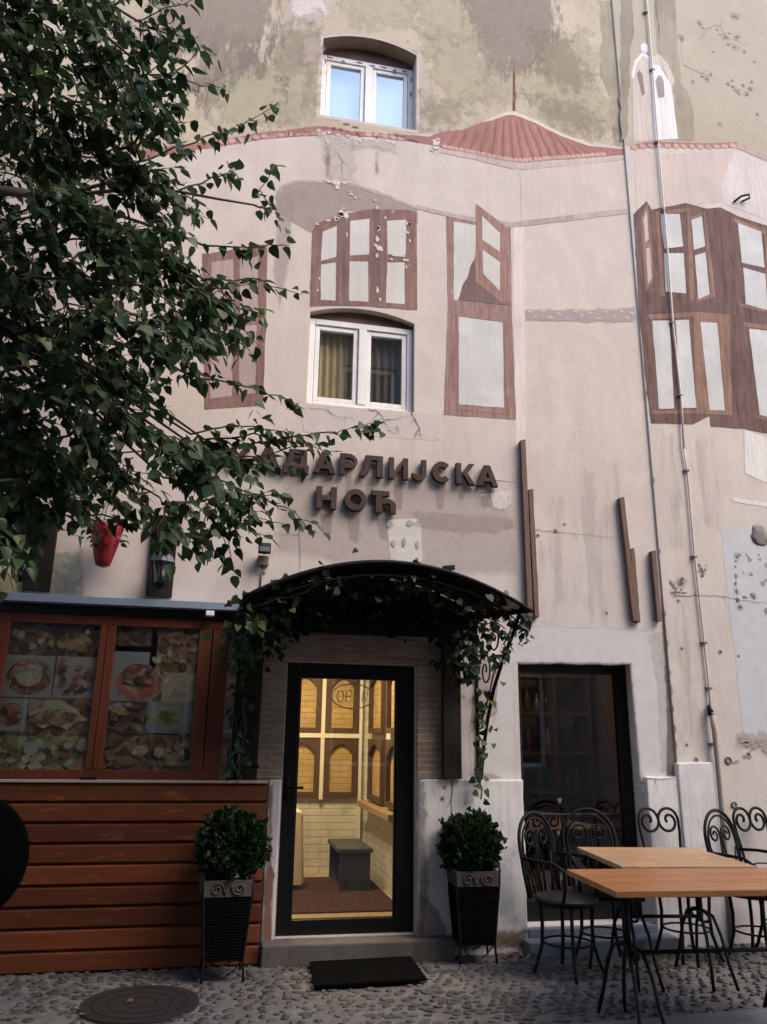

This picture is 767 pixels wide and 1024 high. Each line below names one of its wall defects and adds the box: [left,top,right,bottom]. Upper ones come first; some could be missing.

peeling [289,0,330,21]
crack [656,6,744,80]
peeling [317,123,419,269]
crack [312,408,423,438]
spalling [734,554,767,609]
spalling [732,737,767,763]